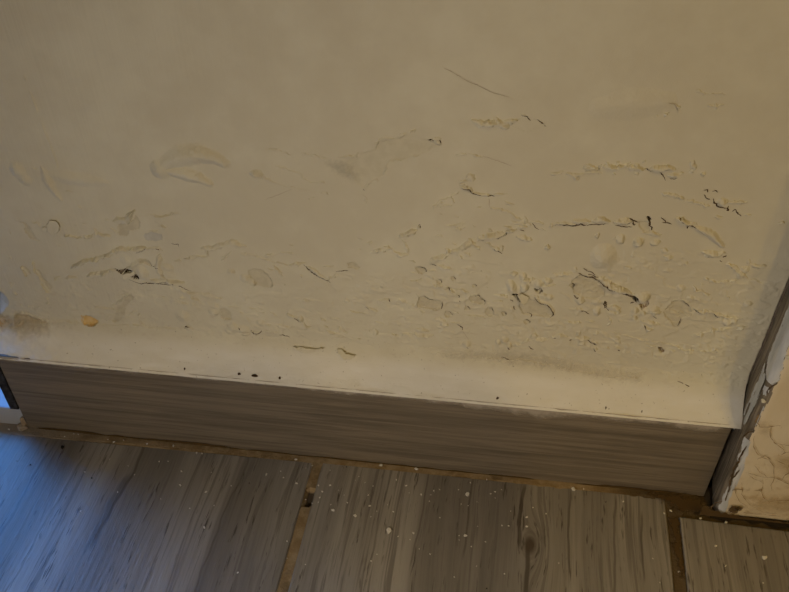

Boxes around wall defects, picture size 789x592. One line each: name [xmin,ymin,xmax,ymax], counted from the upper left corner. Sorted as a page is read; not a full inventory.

peeling [549,216,662,237]
peeling [732,306,789,432]
peeling [718,437,751,513]
crack [711,415,789,516]